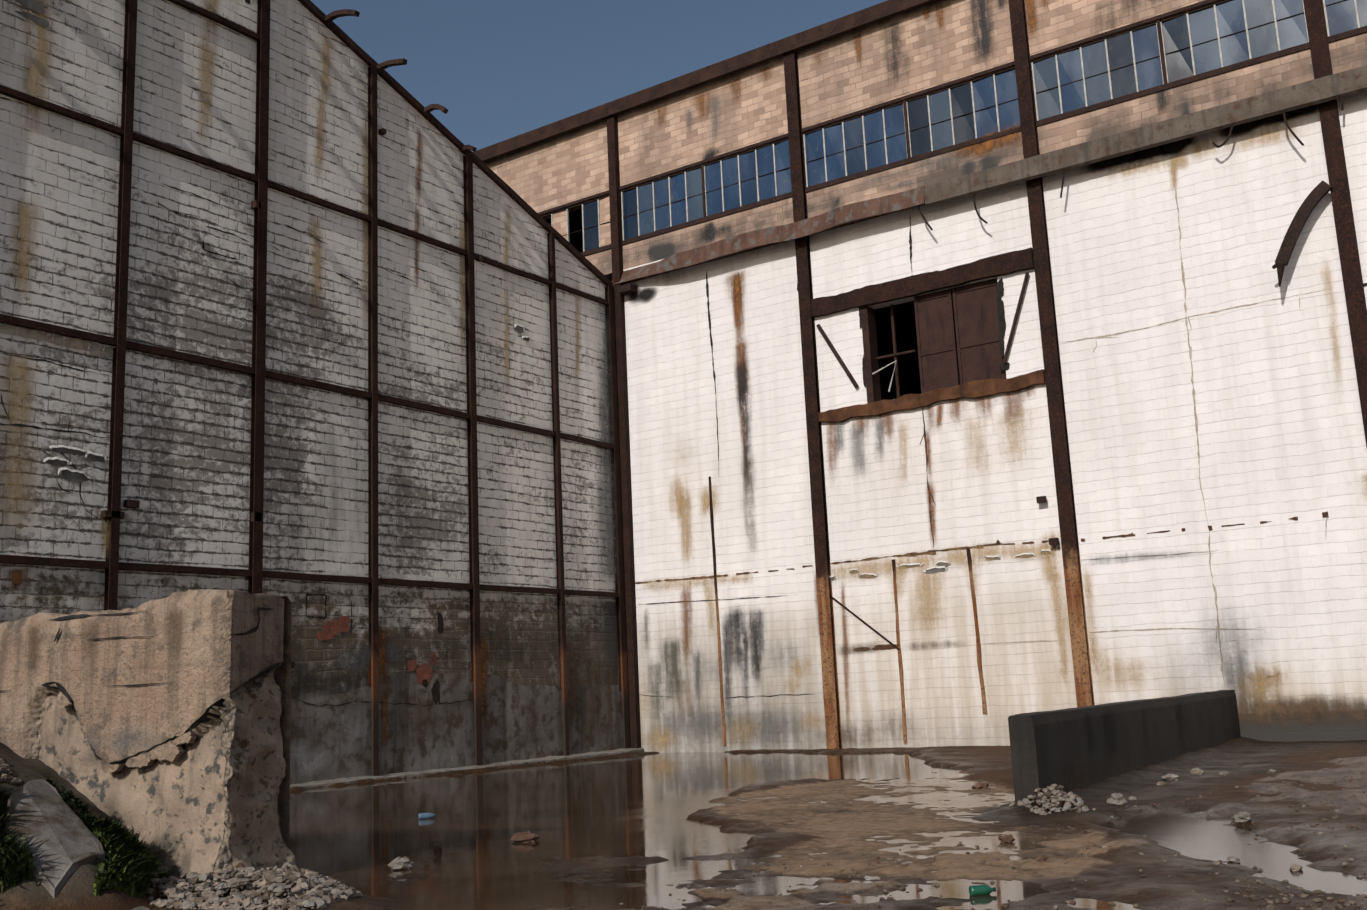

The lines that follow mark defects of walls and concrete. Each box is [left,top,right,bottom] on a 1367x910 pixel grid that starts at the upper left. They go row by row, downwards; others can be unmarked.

damp [971,0,1004,58]
rust [317,42,329,162]
damp [738,365,750,475]
crack [984,155,1322,690]
damp [655,643,680,707]
damp [724,611,762,697]
damp [1228,661,1270,693]